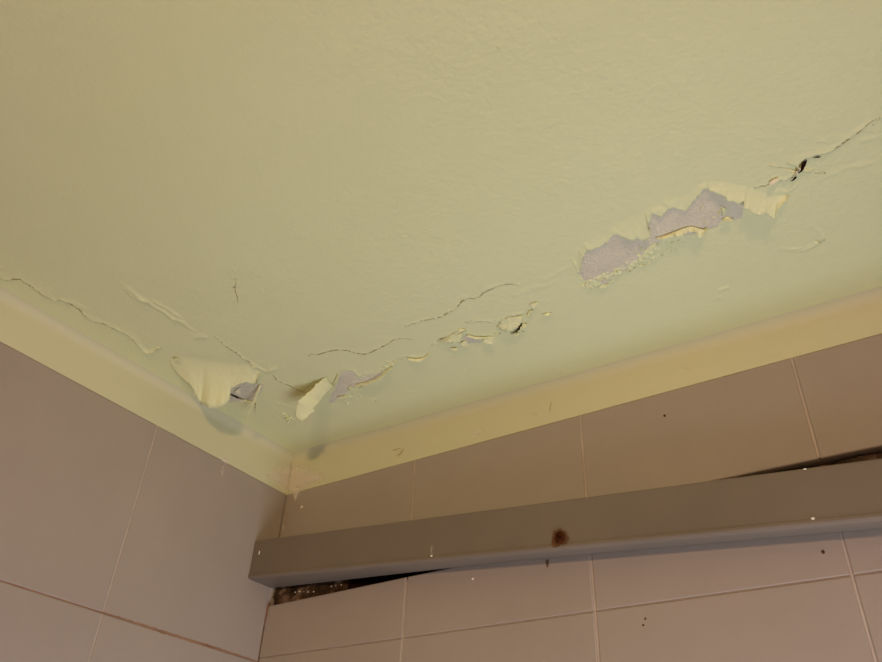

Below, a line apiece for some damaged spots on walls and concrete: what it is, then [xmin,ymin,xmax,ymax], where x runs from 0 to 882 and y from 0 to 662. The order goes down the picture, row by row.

peeling [571,181,789,289]
peeling [170,357,264,419]
crack [307,337,412,356]
peeling [282,300,552,423]
spalling [811,453,882,468]
spalling [273,568,448,605]